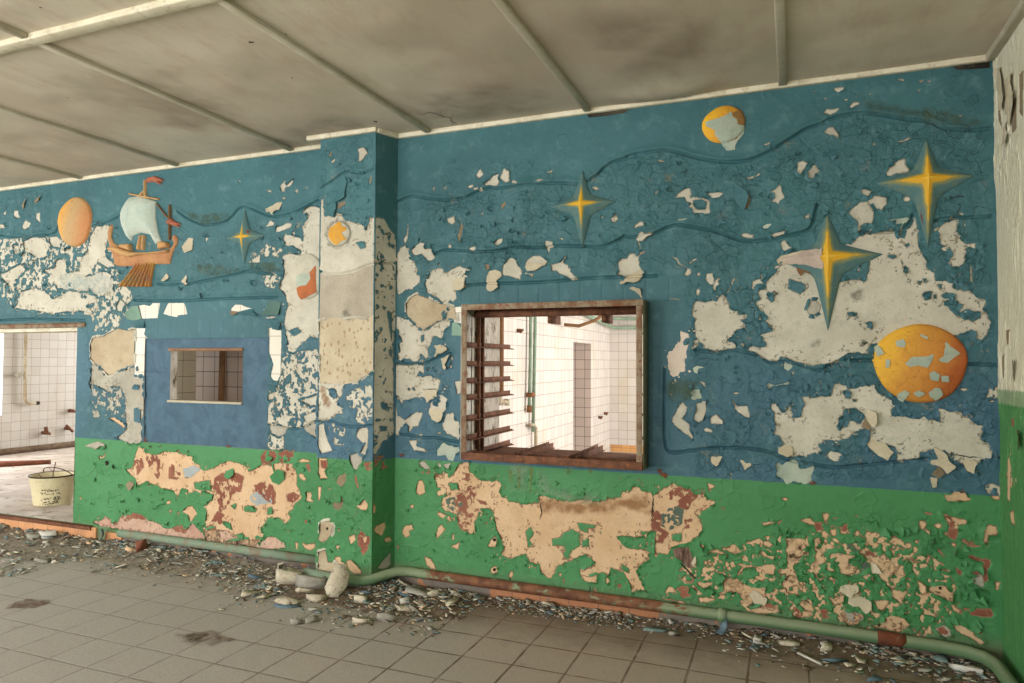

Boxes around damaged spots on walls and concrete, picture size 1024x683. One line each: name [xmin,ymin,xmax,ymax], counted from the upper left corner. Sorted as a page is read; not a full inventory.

peeling [0,147,1019,648]